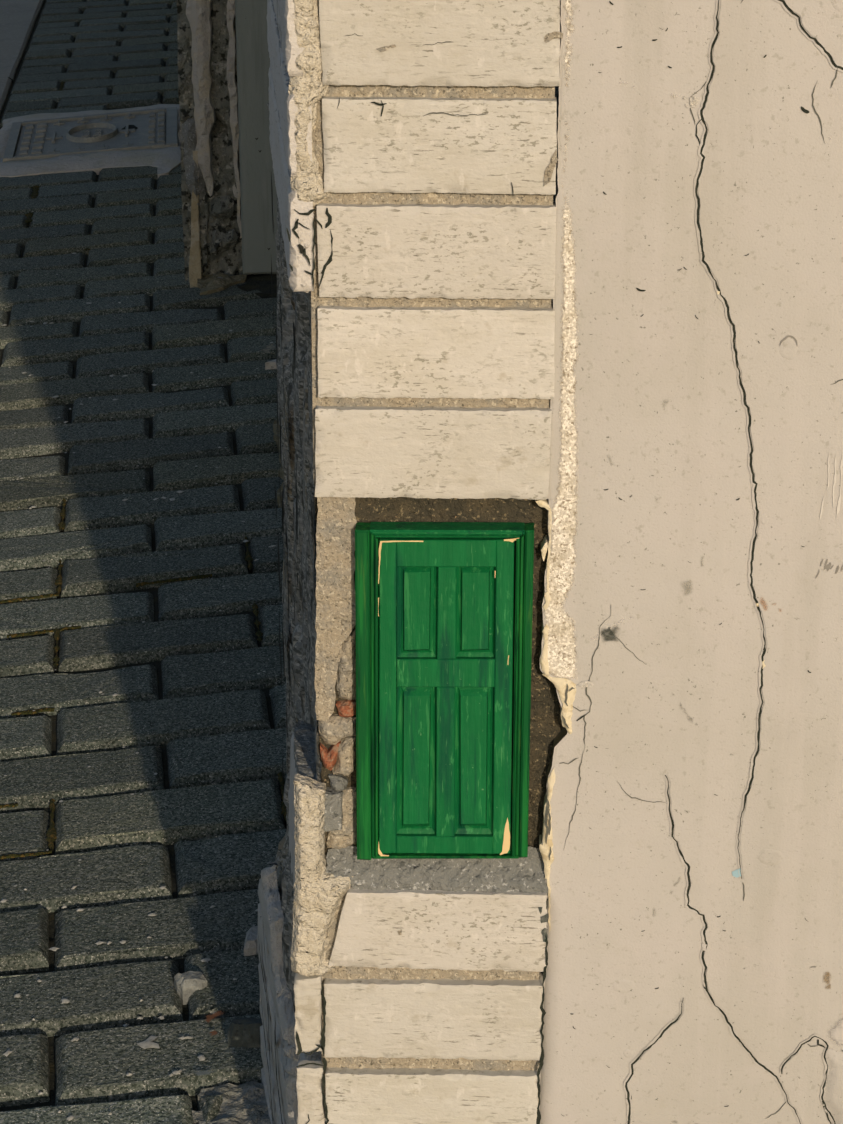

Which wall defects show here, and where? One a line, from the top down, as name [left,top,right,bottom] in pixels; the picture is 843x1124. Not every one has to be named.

crack [774,0,843,140]
crack [285,208,333,289]
crack [690,0,768,901]
peeling [535,499,576,734]
spalling [318,629,357,849]
peeling [538,768,555,942]
crack [620,775,837,1124]